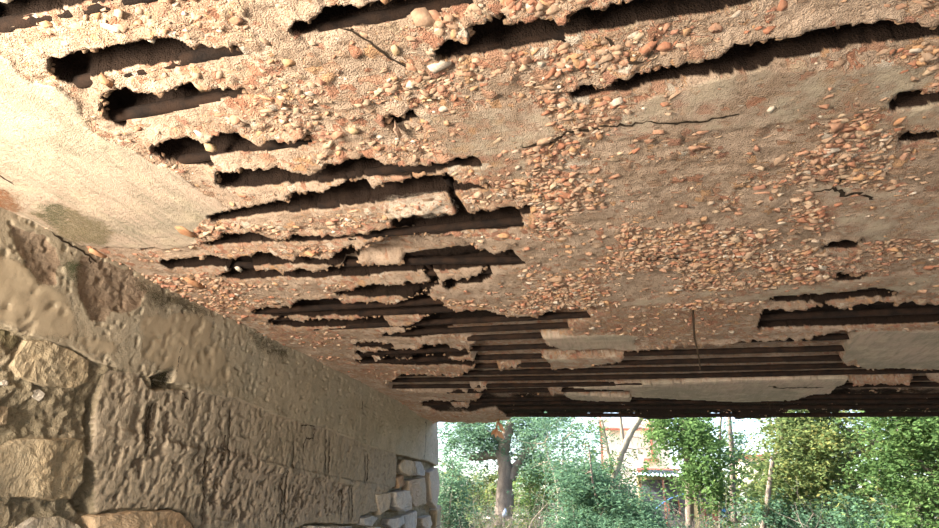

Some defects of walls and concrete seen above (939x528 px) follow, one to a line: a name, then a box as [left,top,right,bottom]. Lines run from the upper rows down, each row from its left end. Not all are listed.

crack [340,28,425,80]
crack [520,114,739,148]
spalling [0,0,939,322]
crack [813,177,873,200]